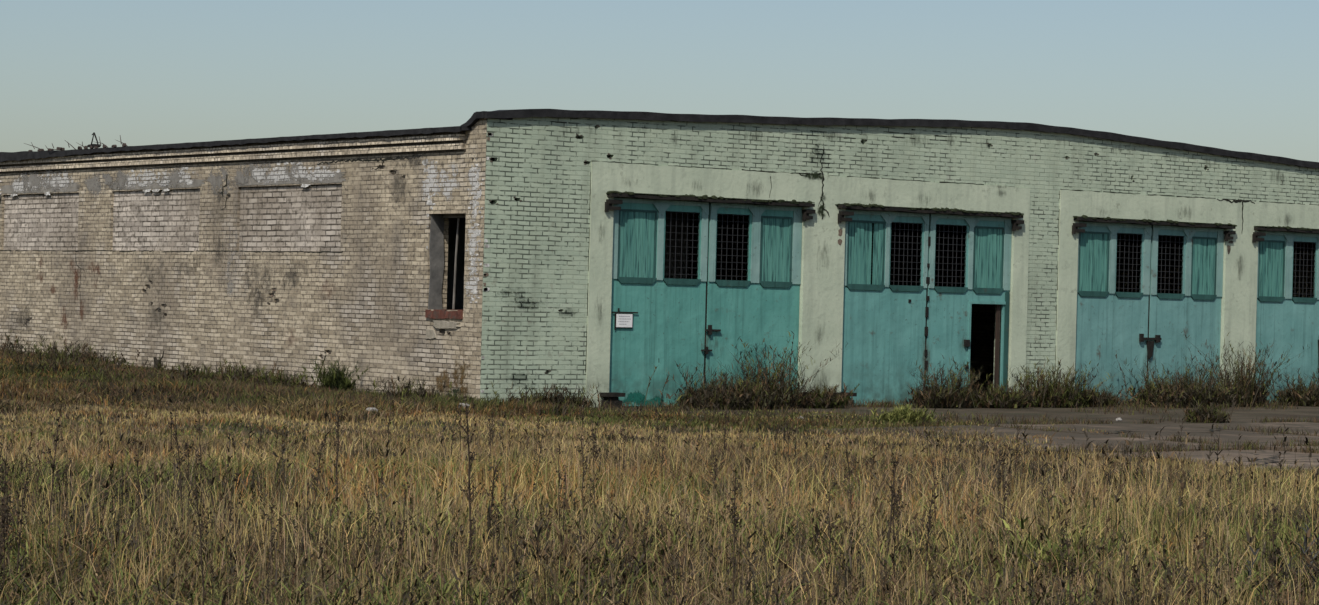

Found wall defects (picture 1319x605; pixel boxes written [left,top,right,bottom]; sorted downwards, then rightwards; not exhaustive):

peeling [0,162,341,199]